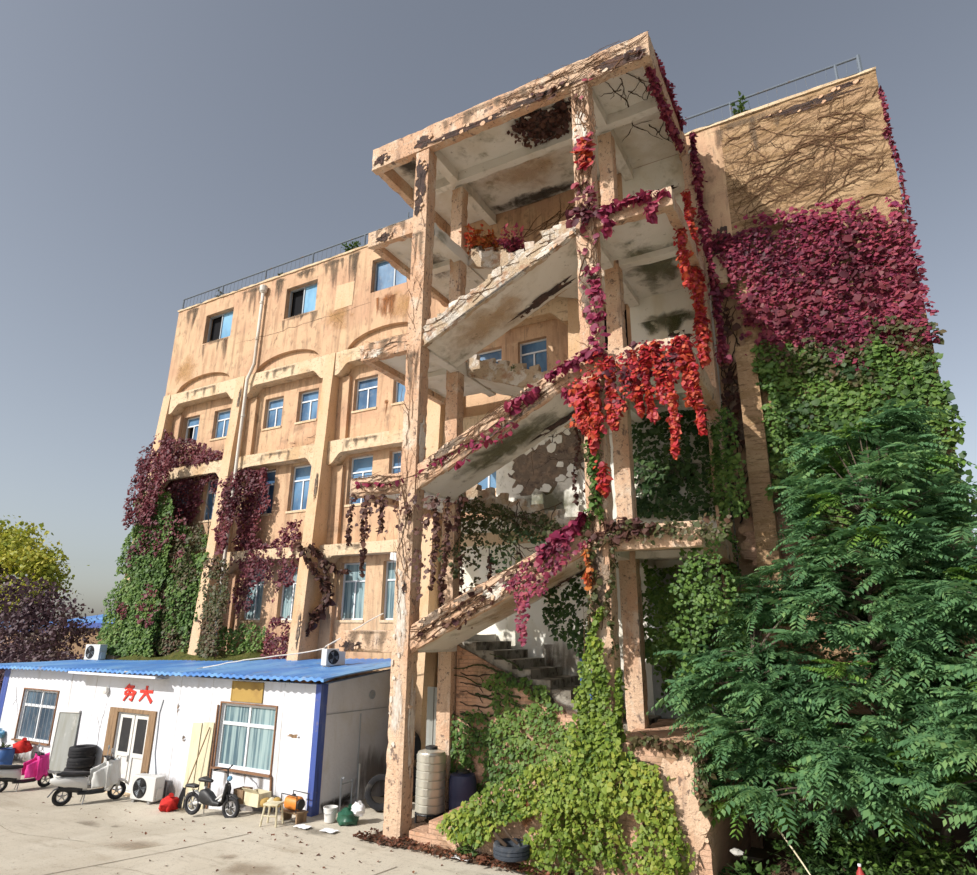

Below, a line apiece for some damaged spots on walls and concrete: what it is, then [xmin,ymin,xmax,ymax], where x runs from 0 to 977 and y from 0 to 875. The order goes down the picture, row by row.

damp [298,253,358,284]
damp [631,250,678,281]
damp [669,314,683,336]
flaking render [506,408,590,496]